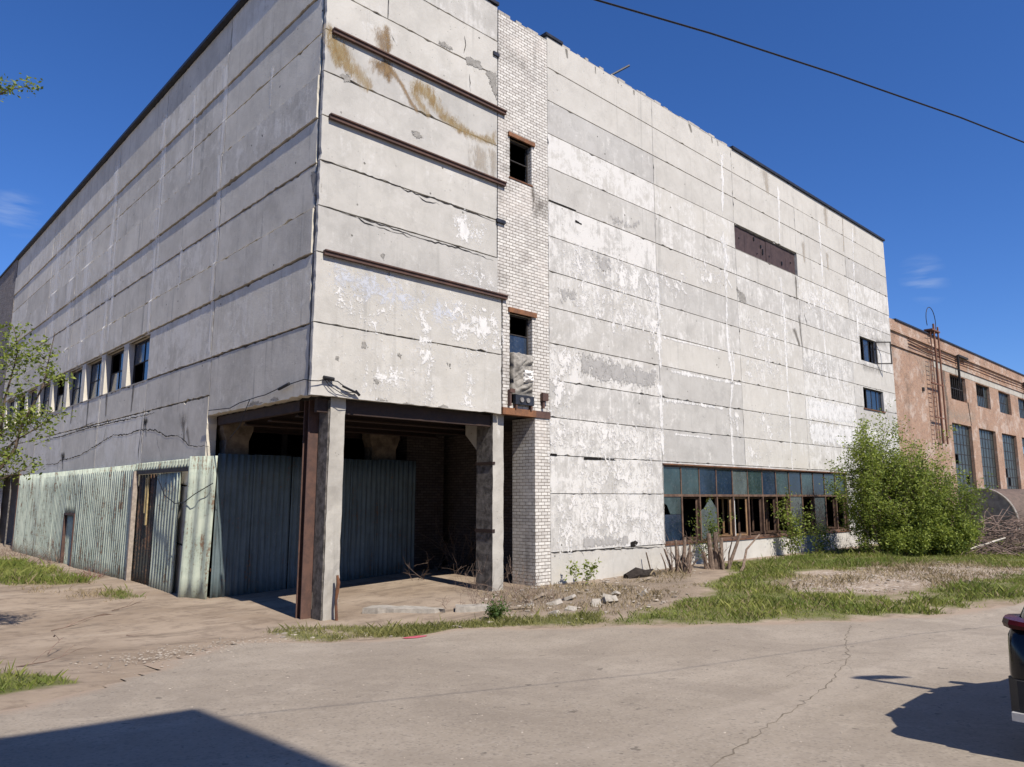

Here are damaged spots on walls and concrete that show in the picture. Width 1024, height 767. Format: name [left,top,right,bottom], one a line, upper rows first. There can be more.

rust [327,28,371,90]
rust [372,26,494,143]
crack [340,164,490,220]
crack [335,209,485,258]
peeling [332,275,508,408]
peeling [549,377,572,411]
peeling [577,351,658,391]
water stain [654,232,741,463]
water stain [780,277,802,470]
crack [37,412,209,472]
peeling [553,454,664,558]